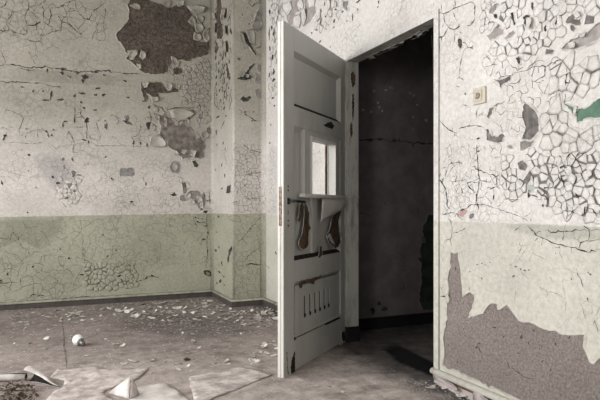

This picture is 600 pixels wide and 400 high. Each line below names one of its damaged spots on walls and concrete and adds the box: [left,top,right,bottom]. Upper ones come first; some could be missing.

crack [0,0,137,91]
crack [0,172,210,301]
flaking render [115,0,361,240]
crack [359,2,599,327]
flaking render [442,249,600,400]
peeling [479,0,600,224]